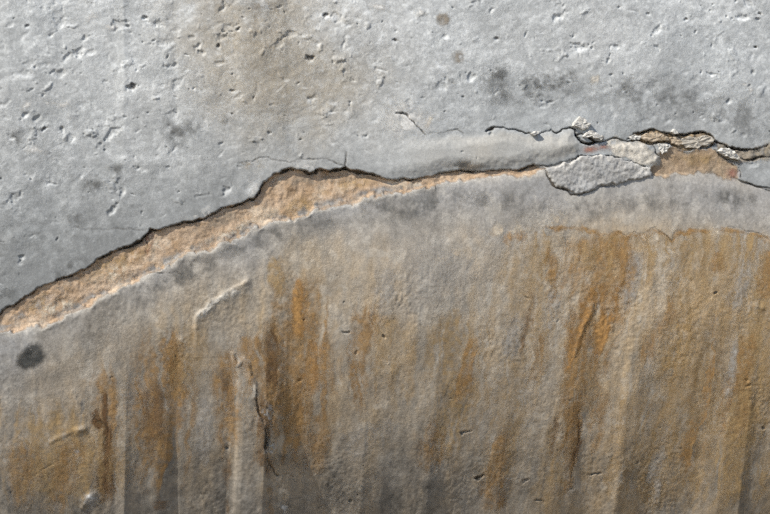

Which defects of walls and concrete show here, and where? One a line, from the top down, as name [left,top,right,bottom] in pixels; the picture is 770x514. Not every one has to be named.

crack [177,190,260,225]
crack [280,159,375,176]
spalling [0,116,770,333]
crack [518,165,605,195]
crack [560,128,768,188]
crack [55,229,157,282]
leakage [20,344,44,368]
rust [243,280,330,472]
rust [564,227,635,462]
rust [92,378,117,493]
rust [135,334,186,487]